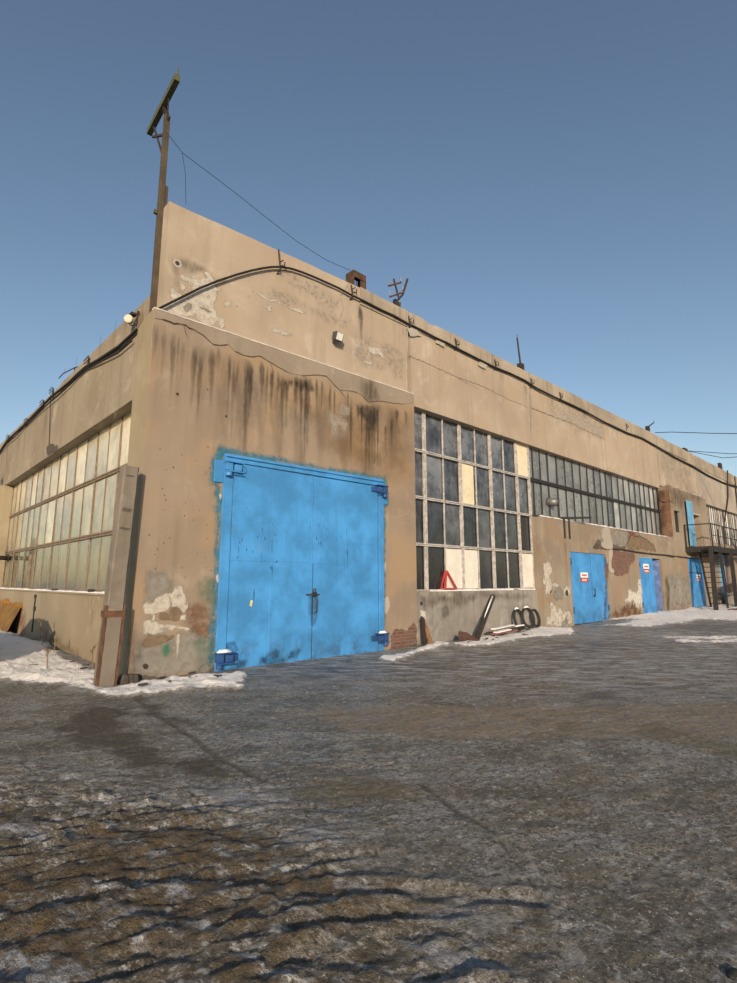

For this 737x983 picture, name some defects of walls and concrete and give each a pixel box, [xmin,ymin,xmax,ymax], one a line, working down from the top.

crack [163,319,400,404]
flaking render [155,271,414,404]
damp [360,384,377,431]
flaking render [593,529,635,579]
flaking render [133,564,215,680]
flaking render [389,610,427,650]
flaking render [543,561,572,627]
flaking render [615,579,642,617]